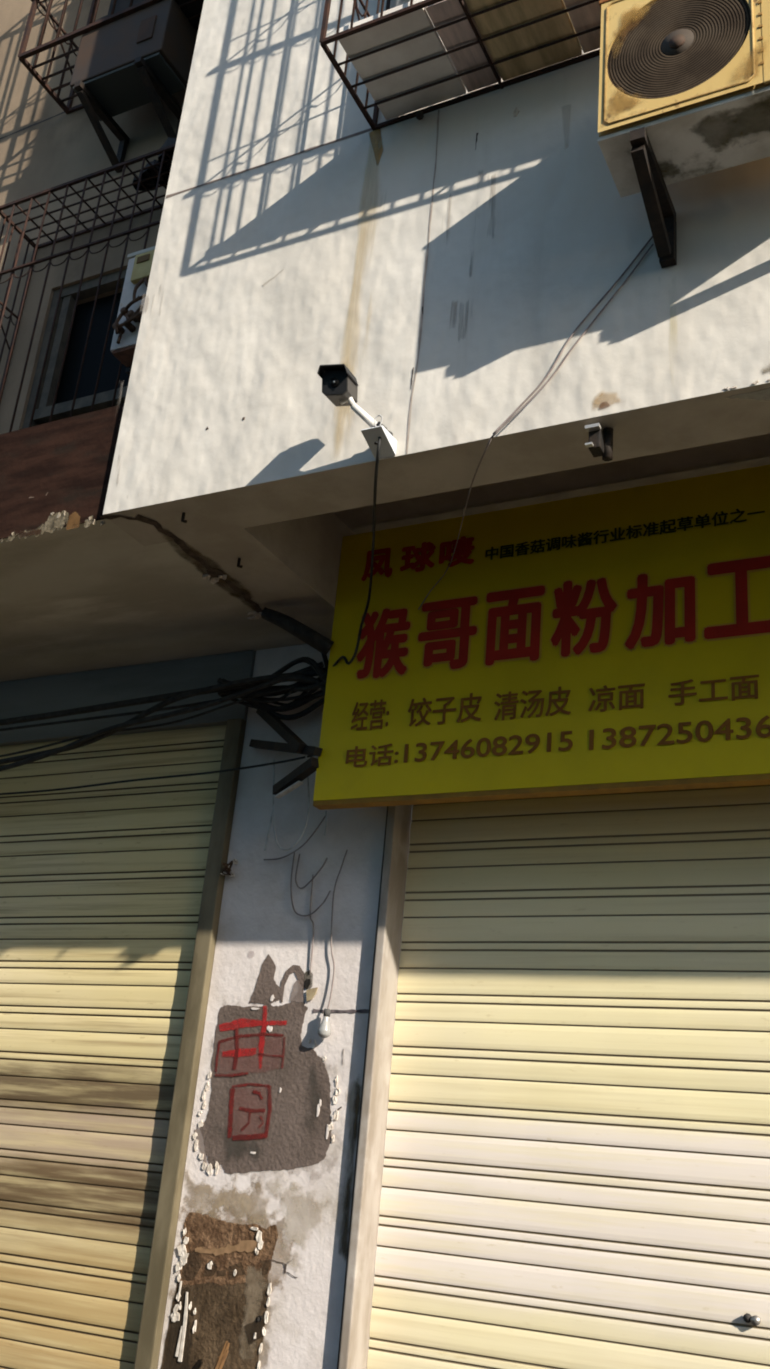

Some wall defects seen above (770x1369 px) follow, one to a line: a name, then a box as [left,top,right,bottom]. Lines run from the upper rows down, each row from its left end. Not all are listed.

rust [369,129,383,165]
peeling [1,510,105,542]
damp [185,1172,275,1224]
flaking render [171,1207,292,1369]
damp [161,1267,276,1369]